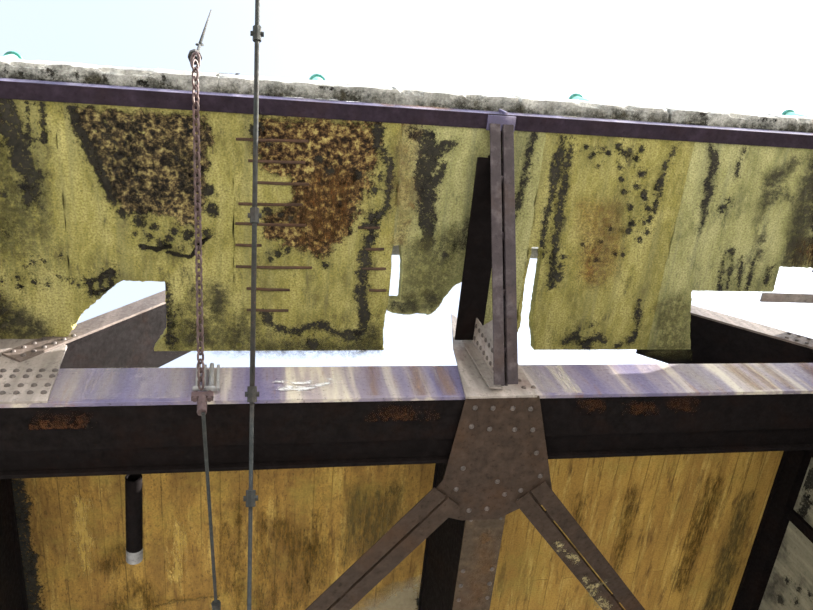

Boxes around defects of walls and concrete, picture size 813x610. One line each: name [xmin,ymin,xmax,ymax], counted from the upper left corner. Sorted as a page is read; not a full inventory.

damp [97,115,144,214]
rust [294,166,357,251]
damp [515,132,538,221]
damp [540,134,577,291]
damp [640,143,679,236]
damp [697,144,734,237]
damp [717,157,813,291]